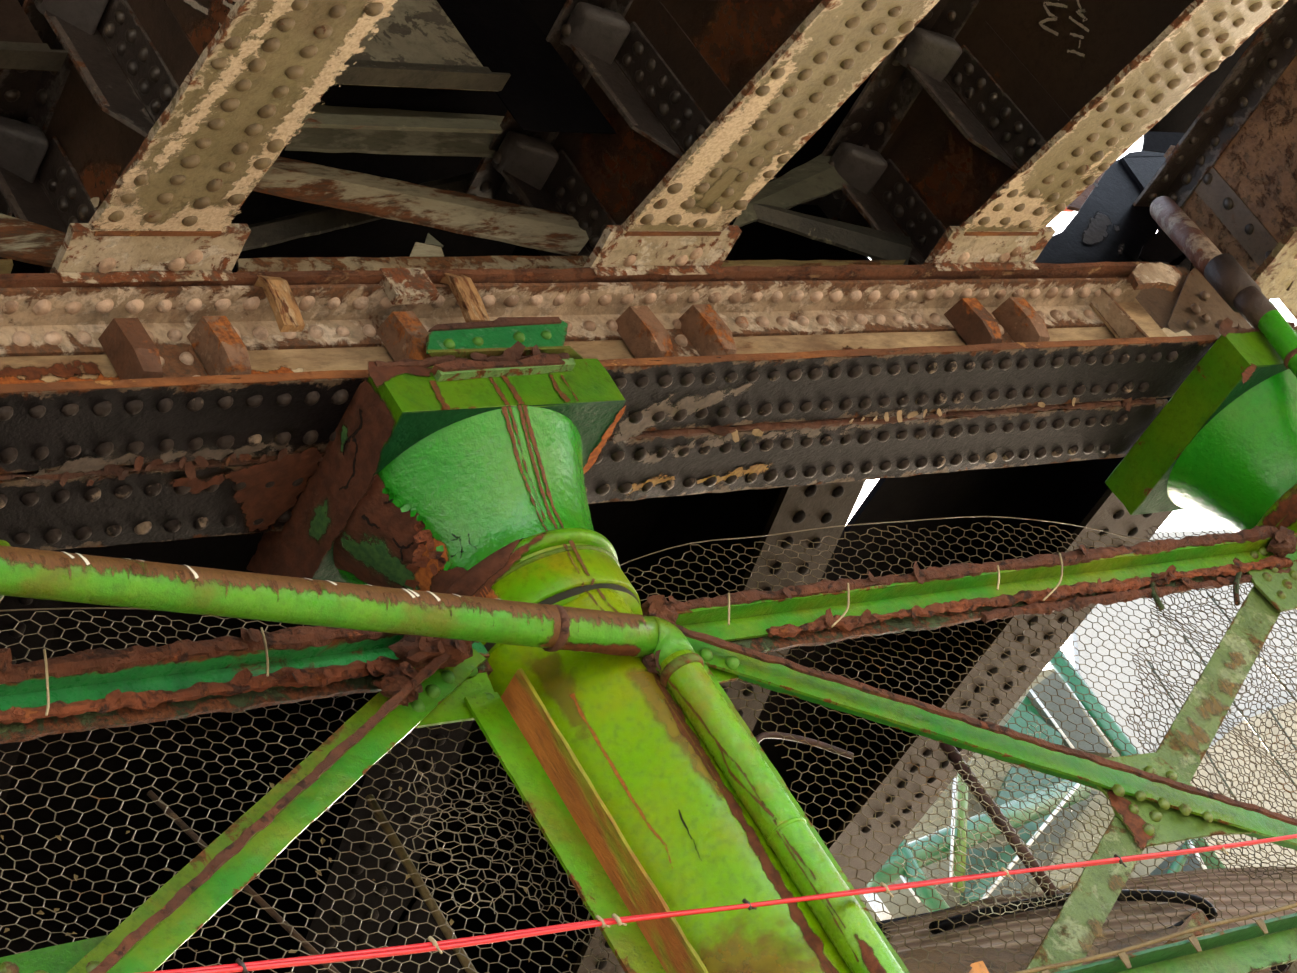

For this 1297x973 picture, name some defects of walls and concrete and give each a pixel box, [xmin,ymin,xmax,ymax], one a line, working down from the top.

peeling [90,0,398,232]
peeling [27,435,294,484]
peeling [613,382,754,444]
peeling [638,408,957,464]
corrosion [0,354,887,973]
corrosion [676,625,1297,826]
corrosion [1107,790,1156,849]